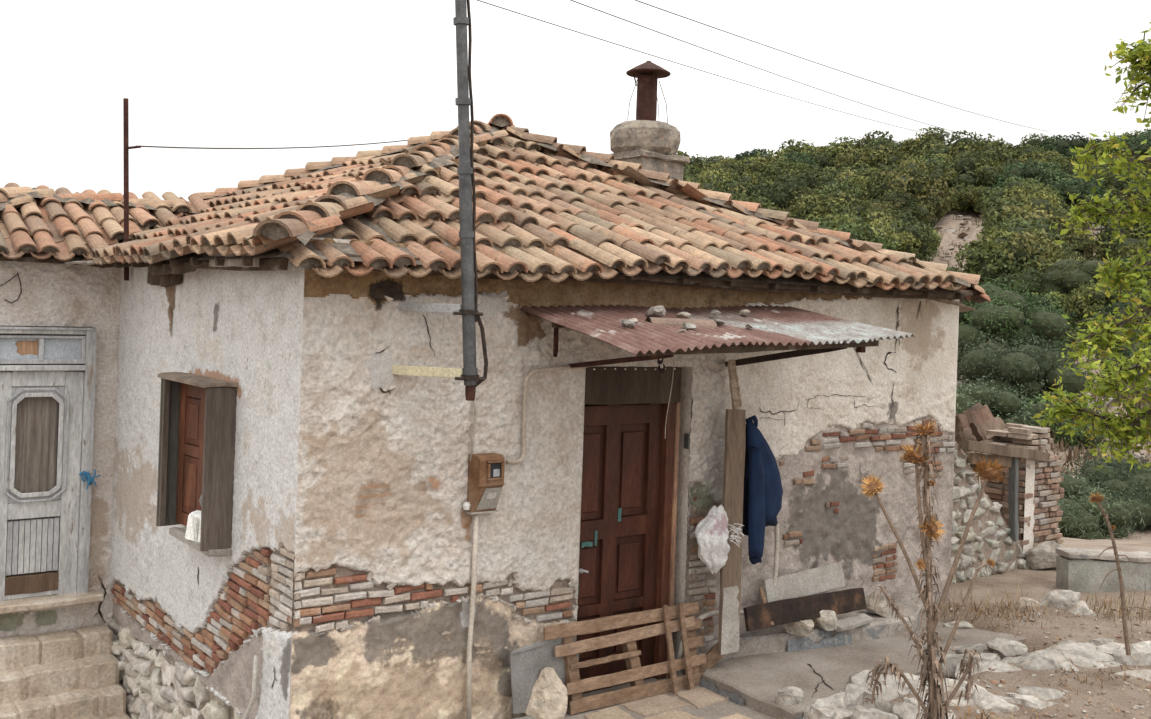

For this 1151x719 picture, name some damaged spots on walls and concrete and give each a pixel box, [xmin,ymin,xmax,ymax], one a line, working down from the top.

flaking render [304,268,871,329]
crack [759,301,923,424]
flaking render [684,415,955,655]
damp [280,629,339,700]
flaking render [108,544,579,719]
damp [364,597,519,697]